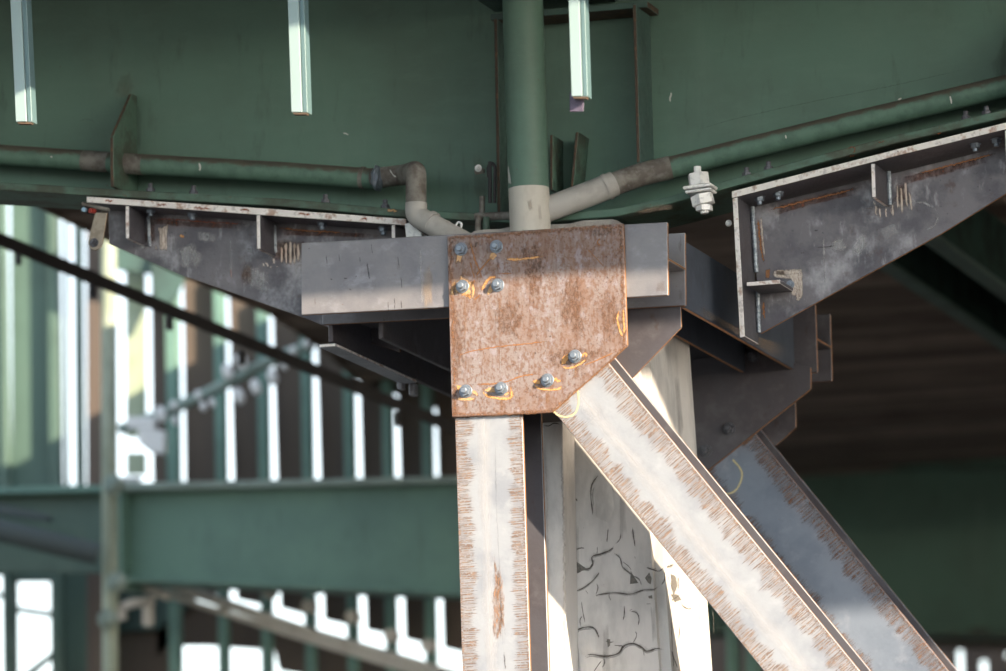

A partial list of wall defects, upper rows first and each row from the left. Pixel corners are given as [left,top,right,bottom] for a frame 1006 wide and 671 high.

rust [773,189,853,213]
rust [906,154,992,182]
rust [448,220,872,671]
crack [577,529,719,671]
rust [742,435,948,671]